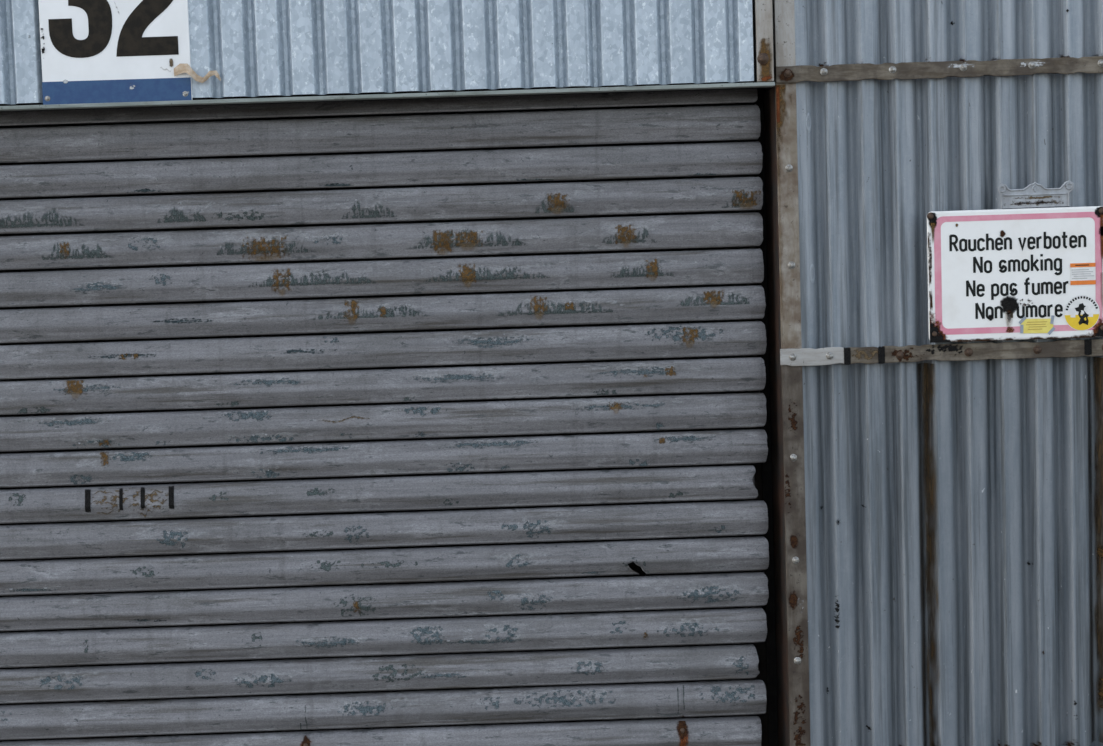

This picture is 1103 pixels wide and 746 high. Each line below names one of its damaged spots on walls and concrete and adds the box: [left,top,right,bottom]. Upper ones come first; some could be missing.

rust [677,685,688,746]